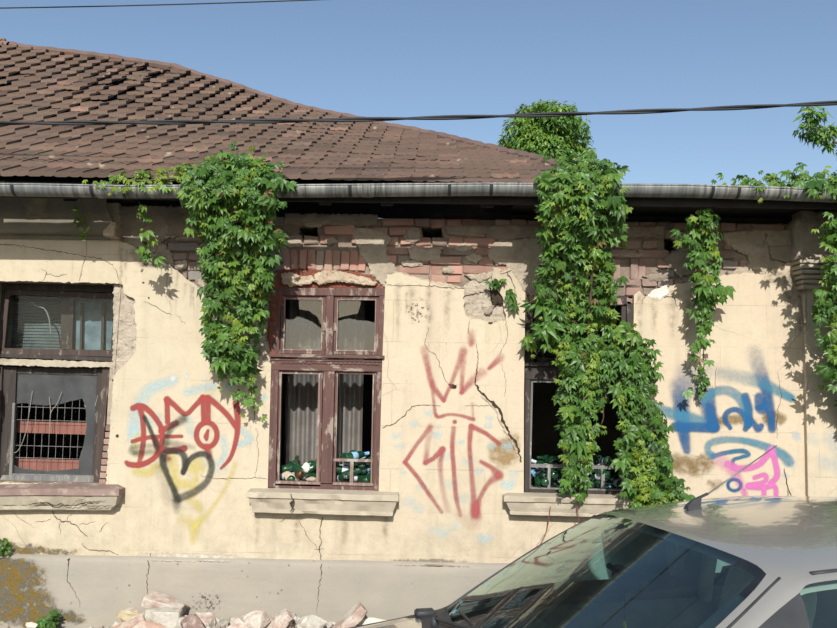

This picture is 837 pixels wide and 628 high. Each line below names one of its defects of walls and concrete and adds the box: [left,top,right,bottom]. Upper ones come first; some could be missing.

crack [0,244,119,281]
flaking render [111,284,137,381]
flaking render [103,205,571,362]
flaking render [602,221,793,306]
crack [468,322,522,463]
crack [14,499,118,602]
crack [280,494,323,609]